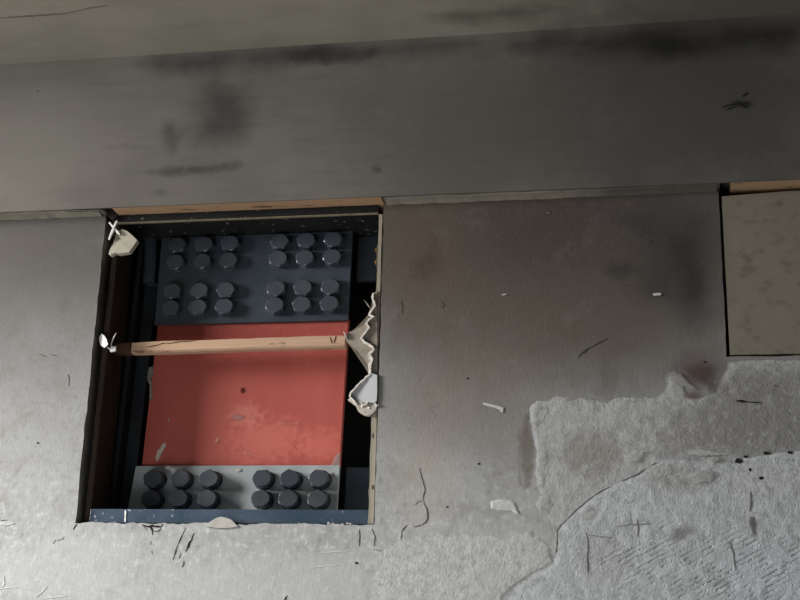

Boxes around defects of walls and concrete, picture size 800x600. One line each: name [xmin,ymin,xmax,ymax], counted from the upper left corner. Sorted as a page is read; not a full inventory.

spalling [349,251,382,332]
spalling [138,379,152,466]
spalling [332,345,379,510]
peeling [374,239,800,600]
crack [401,468,428,536]
crack [555,464,653,552]
crack [586,523,649,574]